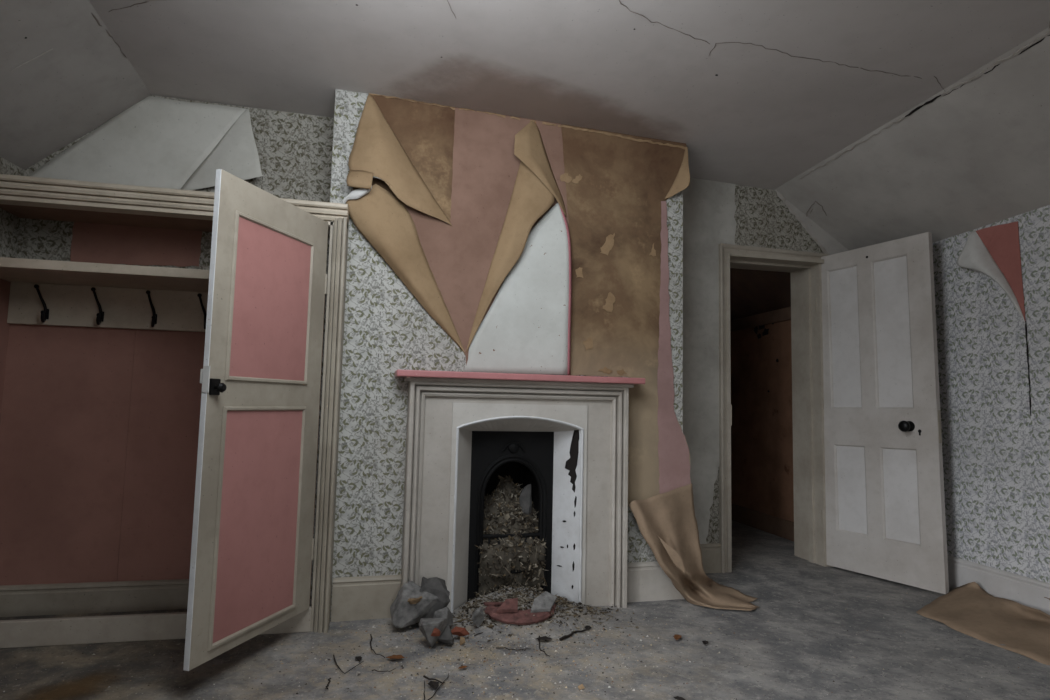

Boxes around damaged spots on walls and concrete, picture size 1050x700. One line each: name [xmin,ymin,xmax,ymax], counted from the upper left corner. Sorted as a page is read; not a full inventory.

crack [619,0,946,92]
peeling [601,233,615,255]
flaking render [683,178,737,544]
peeling [563,430,579,522]
spalling [485,591,557,625]